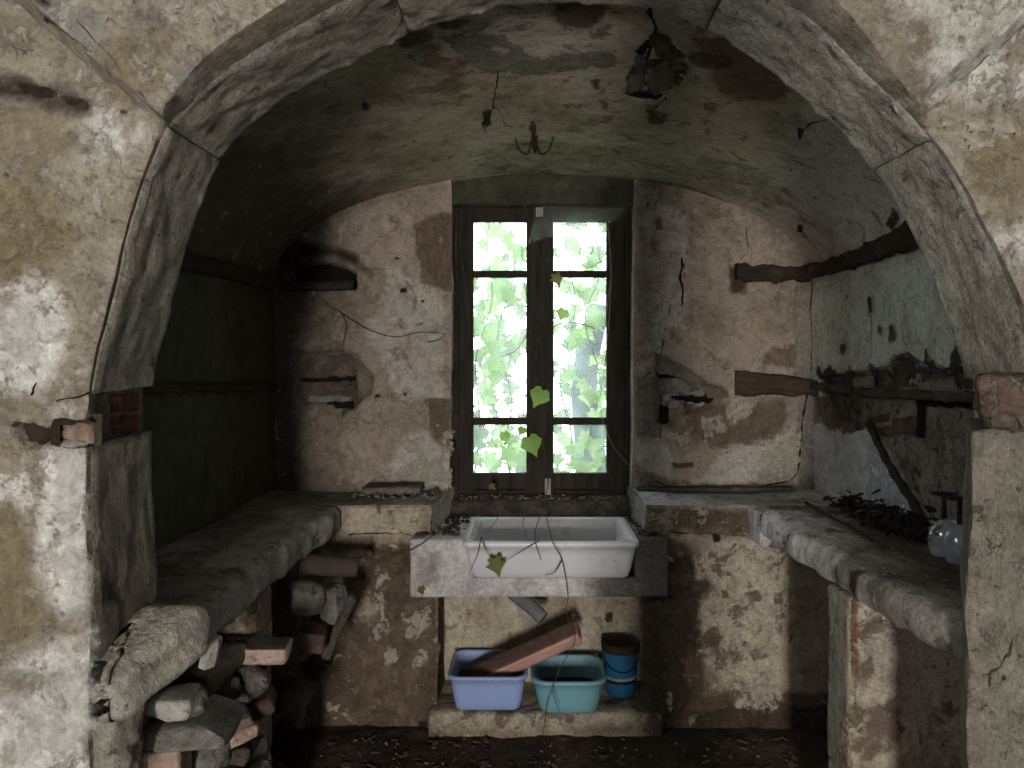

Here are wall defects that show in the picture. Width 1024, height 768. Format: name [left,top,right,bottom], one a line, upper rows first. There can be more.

damp [400,19,470,48]
crack [481,71,511,134]
spalling [625,32,689,124]
spalling [50,414,103,447]
spalling [299,352,380,417]
spalling [644,354,757,453]
peeling [758,432,803,480]
crack [762,282,829,486]
flaking render [816,353,974,518]